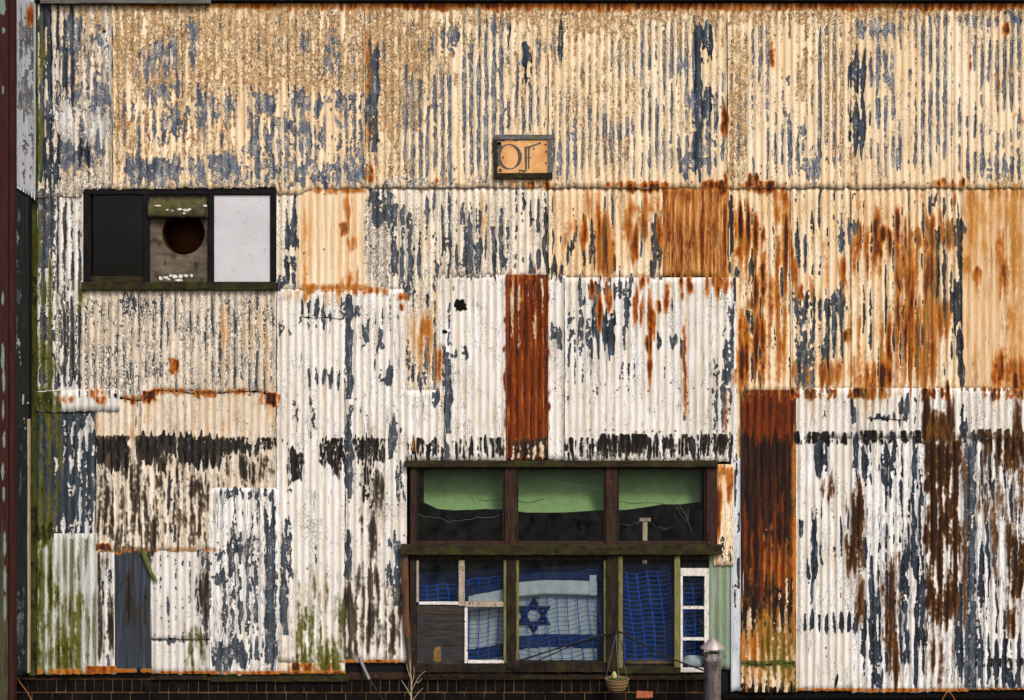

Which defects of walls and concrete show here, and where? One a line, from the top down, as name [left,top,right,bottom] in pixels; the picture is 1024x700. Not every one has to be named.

leakage [96,430,305,663]
corrosion [124,358,281,407]
peeling [152,456,293,674]
corrosion [313,163,374,250]
peeling [343,529,353,580]
leakage [406,434,548,461]
peeling [17,0,1023,506]
corrosion [503,265,551,457]
leakage [565,430,737,465]
corrosion [564,171,1024,693]
peeling [714,393,929,692]
peeling [884,193,1021,690]